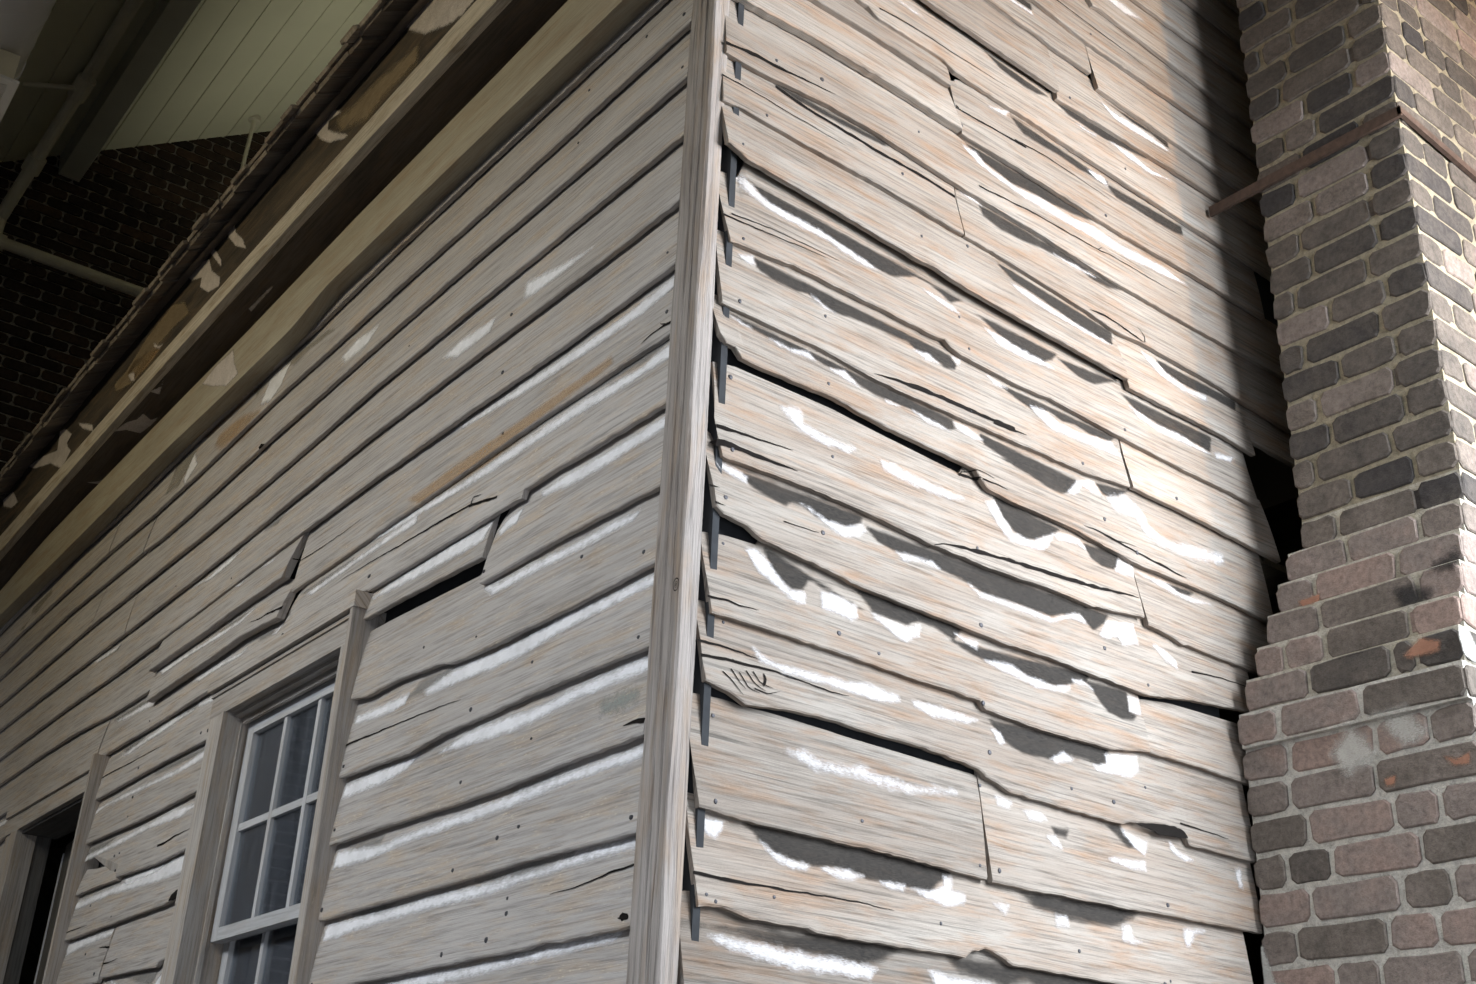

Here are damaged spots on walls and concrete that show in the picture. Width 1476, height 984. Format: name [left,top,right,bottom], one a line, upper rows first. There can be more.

peeling [315,0,474,143]
peeling [228,225,246,248]
peeling [189,250,221,292]
peeling [115,303,188,391]
peeling [203,351,237,386]
crack [874,373,1026,435]
peeling [30,423,93,468]
crack [959,468,1008,490]
crack [344,494,497,578]
crack [929,543,1139,598]
crack [1087,526,1186,578]
crack [1192,671,1246,687]